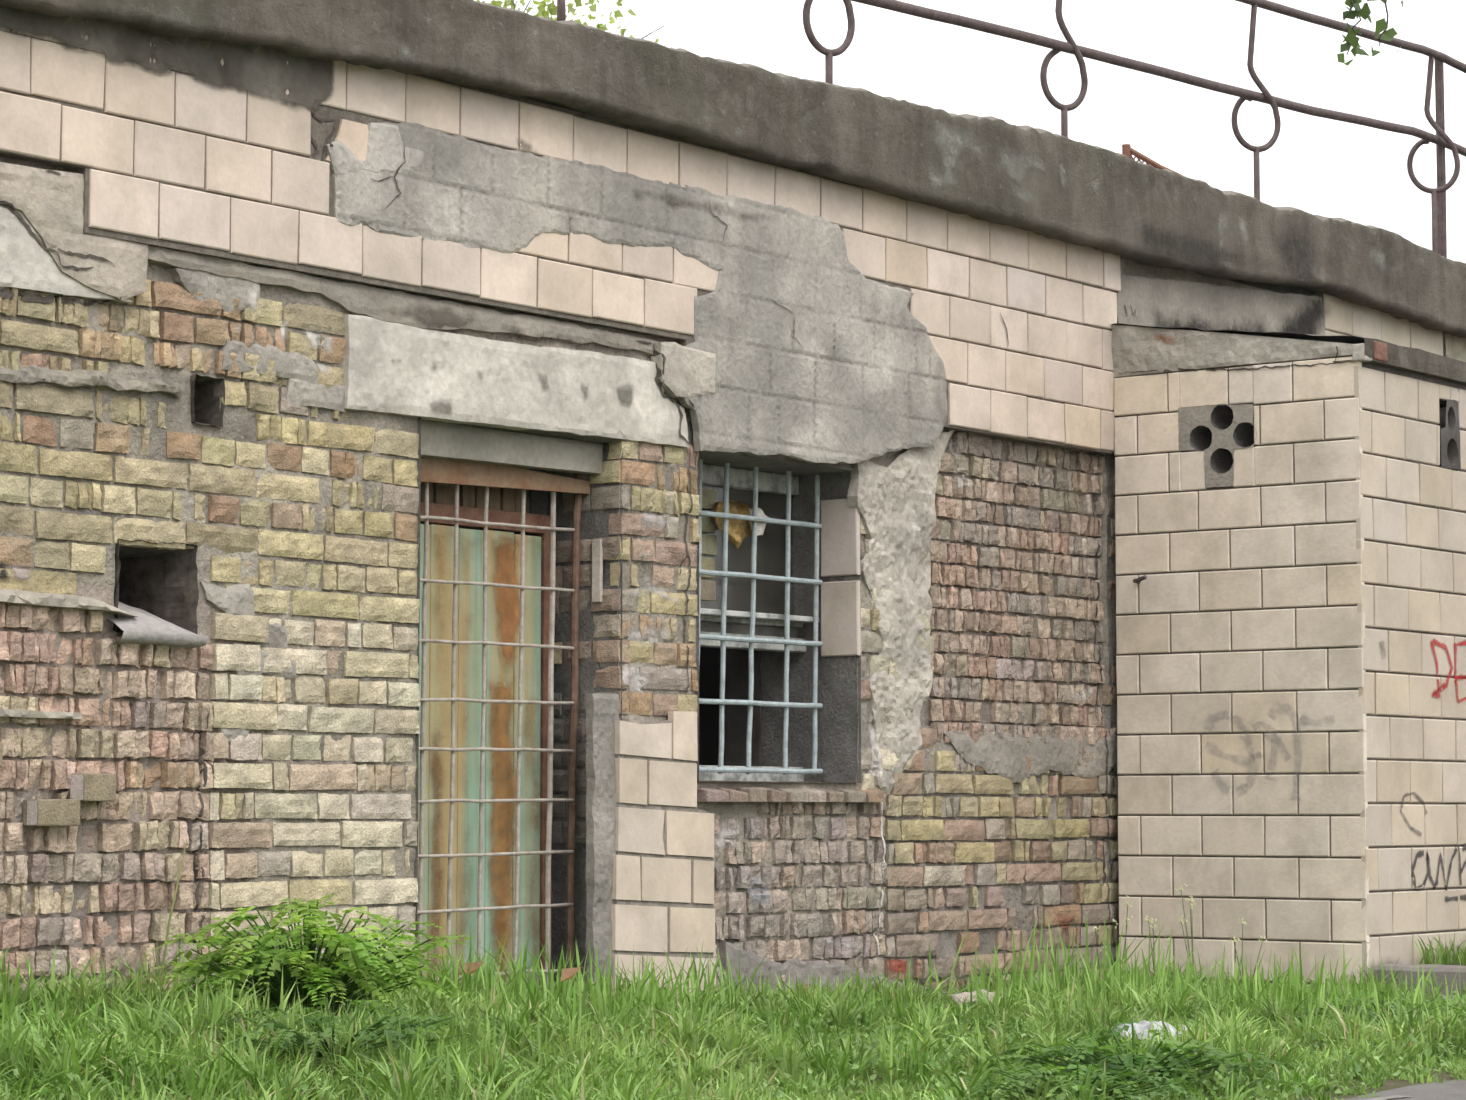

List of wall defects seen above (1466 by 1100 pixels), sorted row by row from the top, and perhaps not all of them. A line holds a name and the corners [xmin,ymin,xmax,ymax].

crack [370,142,406,208]
crack [0,201,121,306]
damp [1158,300,1324,335]
crack [637,340,694,700]
corrosion [494,541,520,661]
corrosion [431,740,442,978]
corrosion [490,684,538,977]